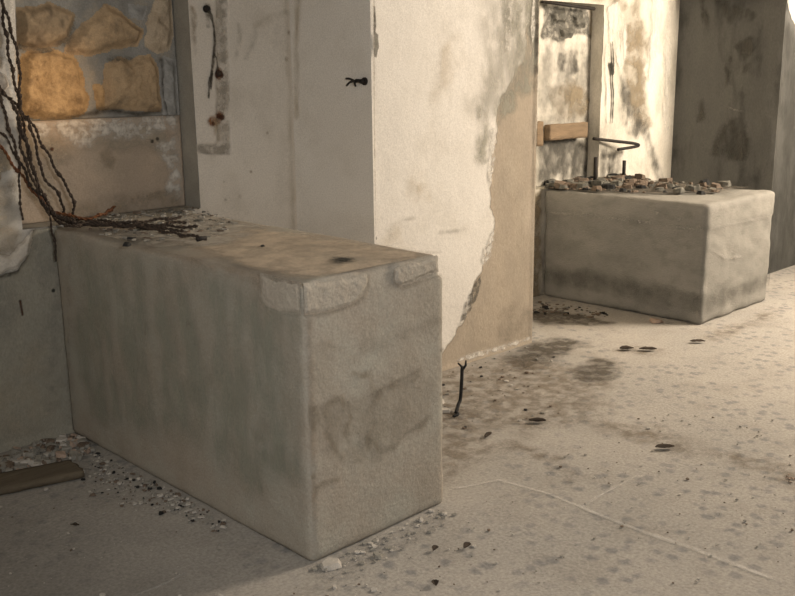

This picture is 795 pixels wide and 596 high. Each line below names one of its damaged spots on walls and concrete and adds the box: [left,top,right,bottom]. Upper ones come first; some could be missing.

water stain [608,0,656,137]
water stain [442,0,542,372]
spalling [0,227,75,453]
spalling [259,272,369,315]
spalling [393,255,439,287]